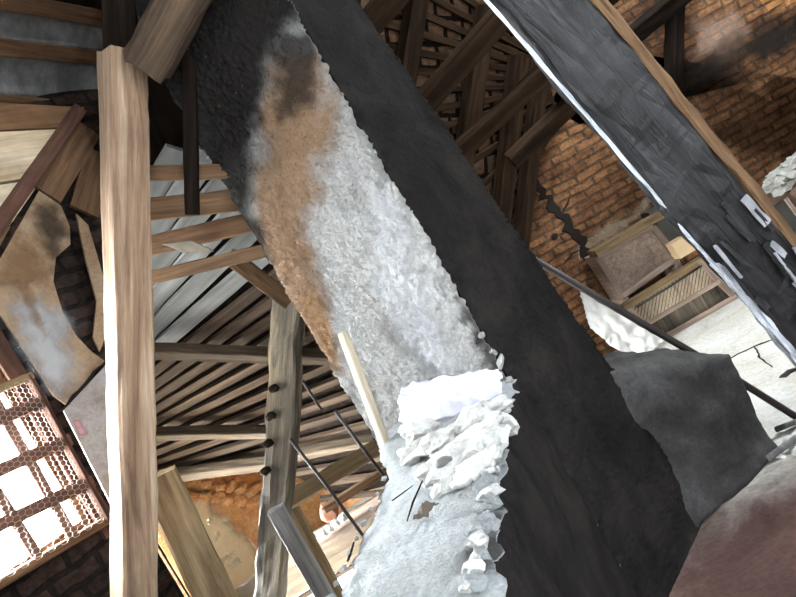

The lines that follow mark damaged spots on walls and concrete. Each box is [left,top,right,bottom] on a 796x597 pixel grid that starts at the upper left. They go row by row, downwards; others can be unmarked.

leakage [279,36,314,113]
crack [536,179,590,262]
flaking render [401,410,504,466]
spalling [449,440,509,595]